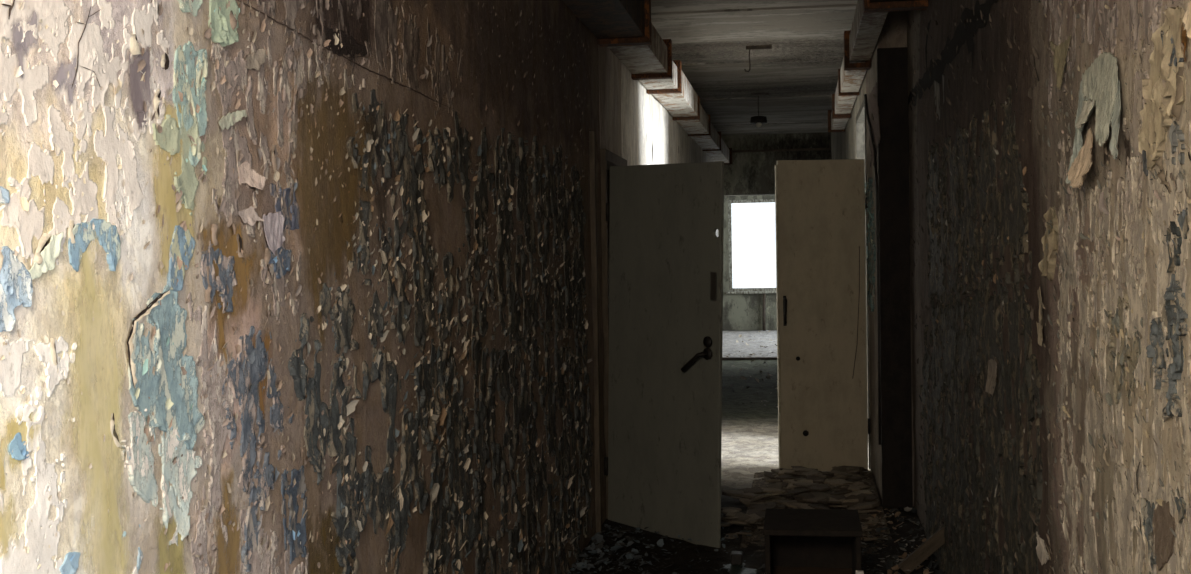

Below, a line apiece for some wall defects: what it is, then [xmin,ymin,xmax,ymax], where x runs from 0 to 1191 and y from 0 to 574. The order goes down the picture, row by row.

crack [71,7,101,89]
peeling [1036,0,1191,574]
crack [127,290,170,388]
flaking render [985,356,997,396]